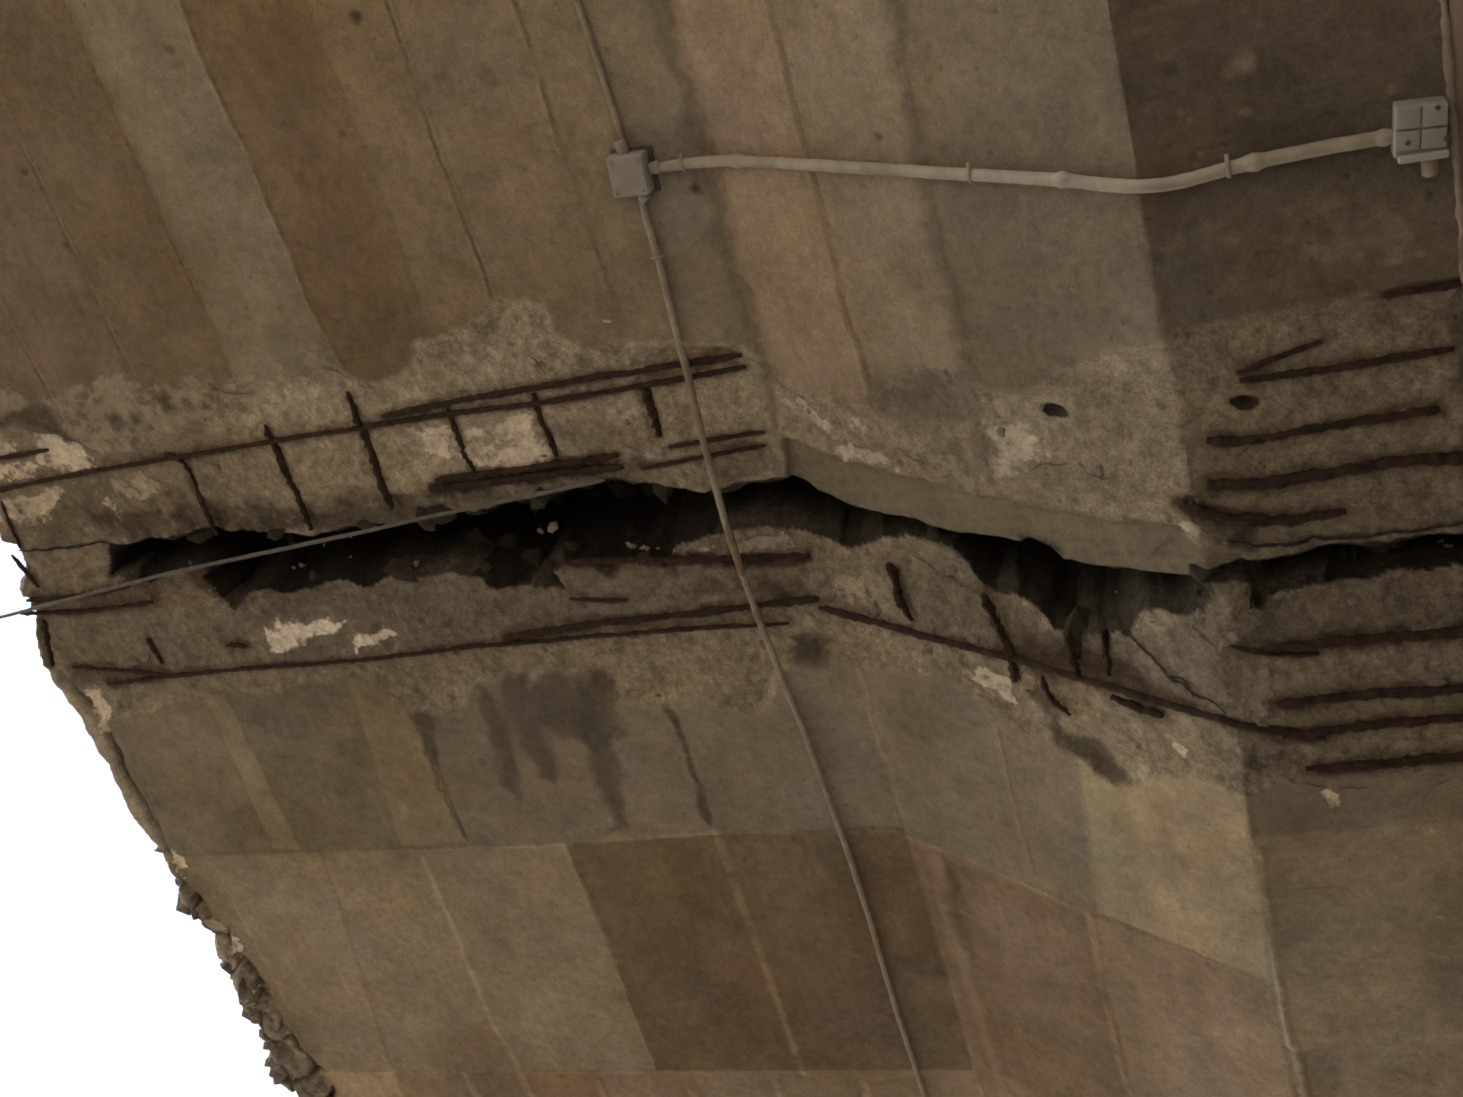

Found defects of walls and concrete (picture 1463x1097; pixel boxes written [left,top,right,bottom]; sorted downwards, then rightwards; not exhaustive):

spalling [0,285,1463,795]
crack [18,474,1463,715]
damp [480,672,626,830]
damp [664,709,711,824]